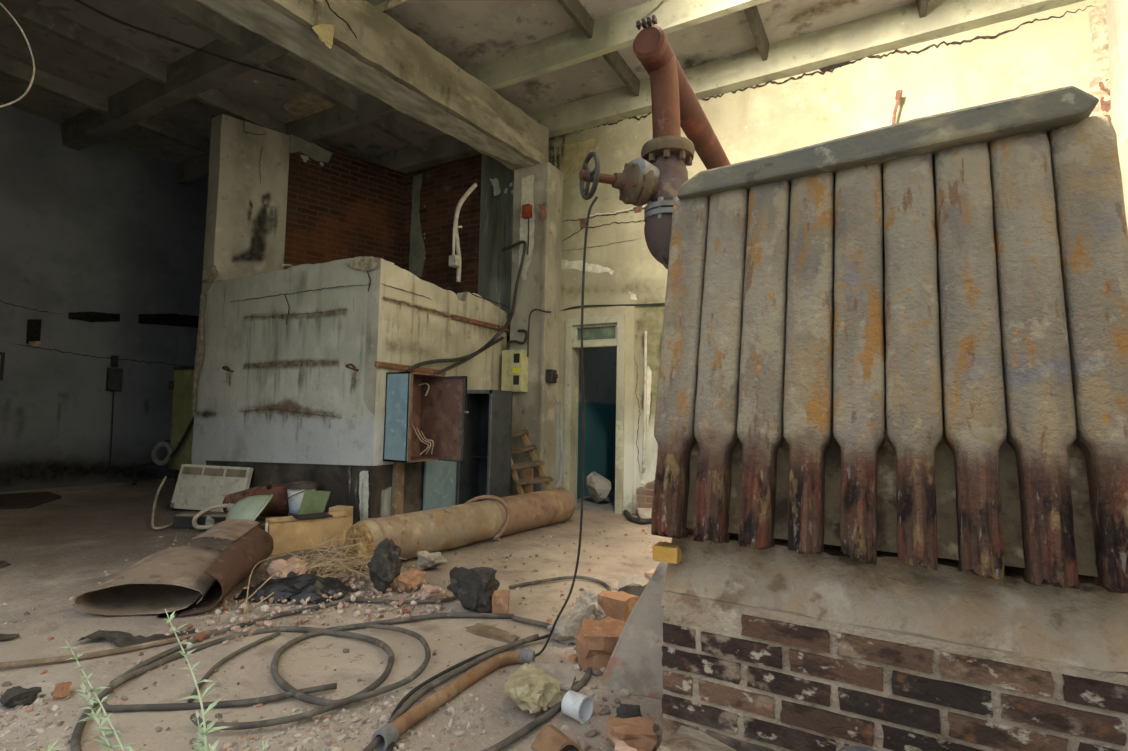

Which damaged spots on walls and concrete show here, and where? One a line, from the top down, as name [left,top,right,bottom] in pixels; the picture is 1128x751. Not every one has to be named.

crack [701,6,1095,101]
spalling [1089,3,1111,120]
crack [570,112,652,135]
crack [562,205,645,251]
corrosion [243,309,345,319]
corrosion [244,360,338,369]
corrosion [241,401,336,428]